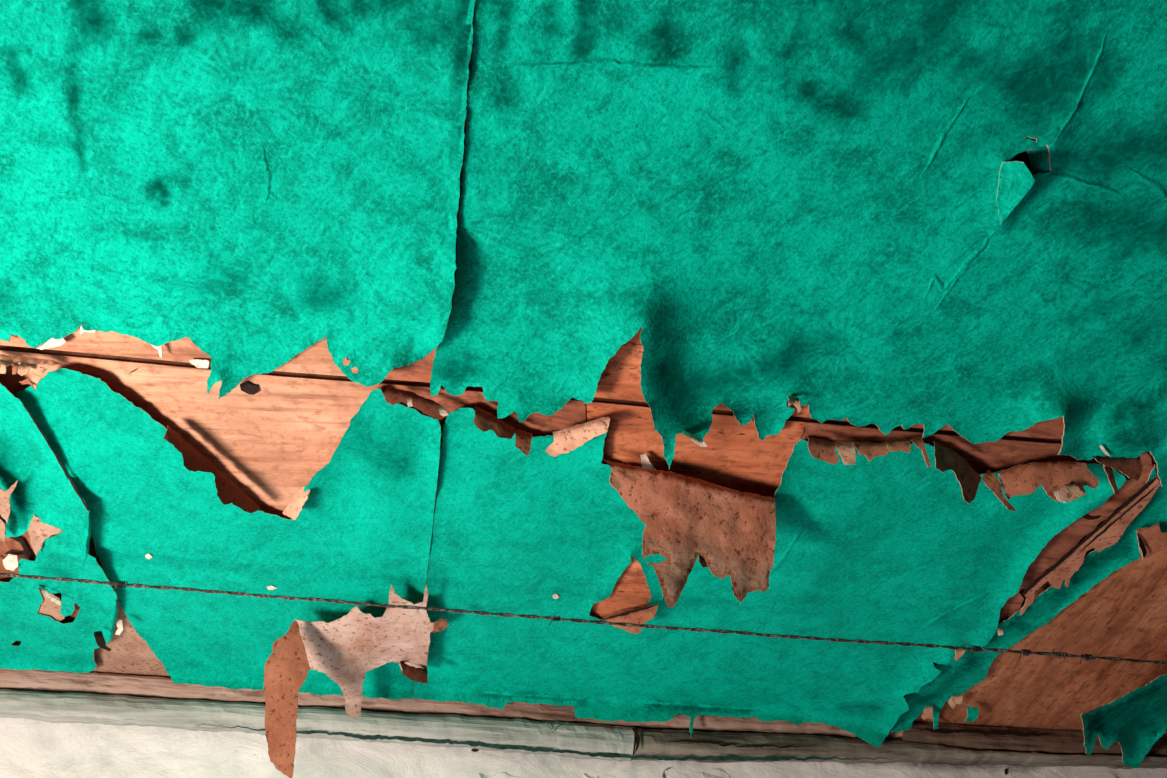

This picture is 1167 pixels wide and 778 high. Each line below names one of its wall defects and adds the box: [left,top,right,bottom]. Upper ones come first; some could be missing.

leakage [201,0,264,18]
leakage [458,0,471,59]
leakage [148,182,167,204]
crack [449,62,471,320]
peeling [0,326,1167,730]
peeling [264,584,449,778]